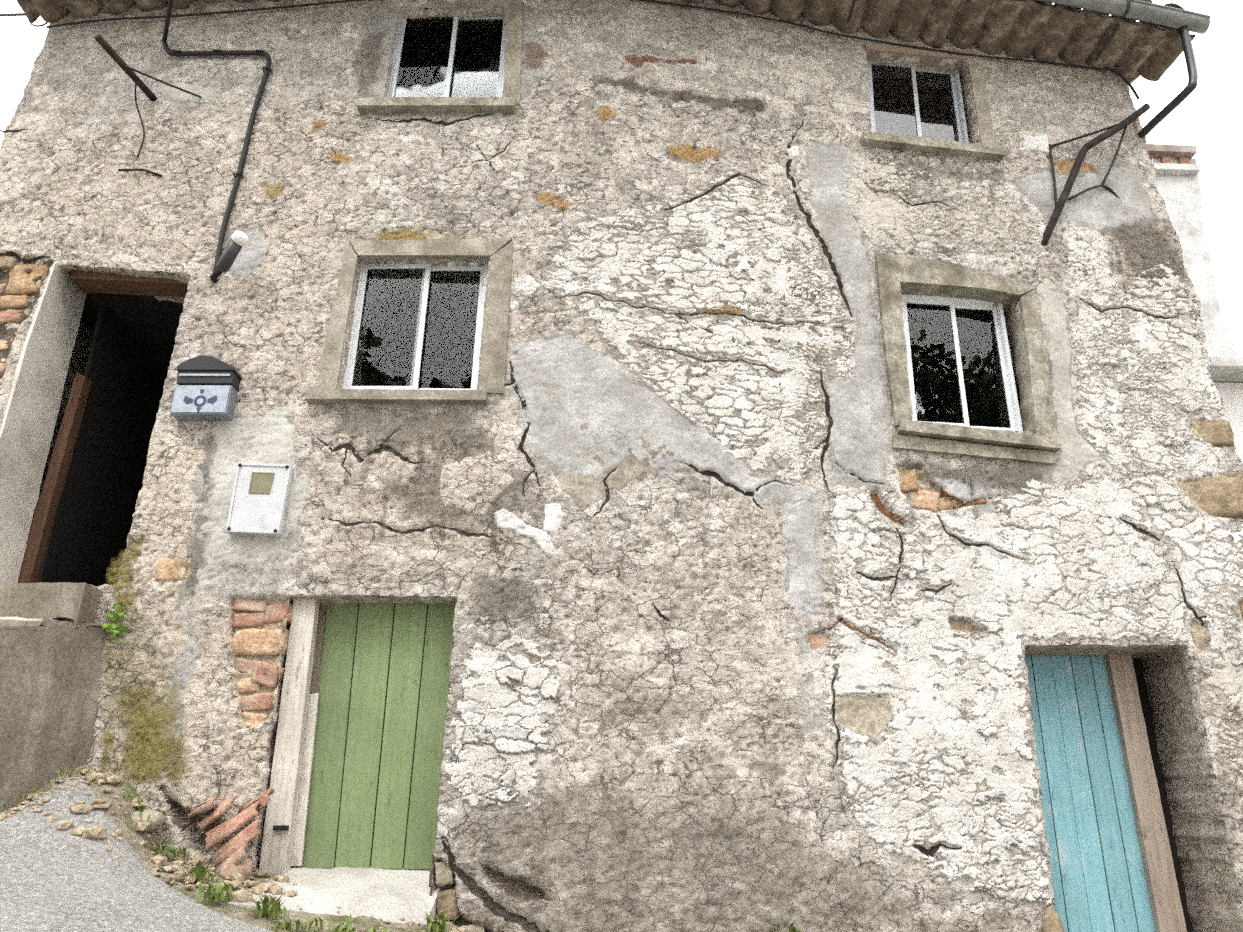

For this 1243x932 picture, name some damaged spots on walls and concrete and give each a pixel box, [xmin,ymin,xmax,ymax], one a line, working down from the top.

crack [664,113,853,317]
flaking render [0,256,53,379]
crack [556,292,820,373]
peeling [539,168,856,484]
crack [316,428,430,477]
crack [321,518,503,540]
crack [937,494,1025,560]
peeling [809,262,1243,906]
leakage [99,733,113,773]
flaking render [227,596,293,731]
peeling [445,635,560,808]